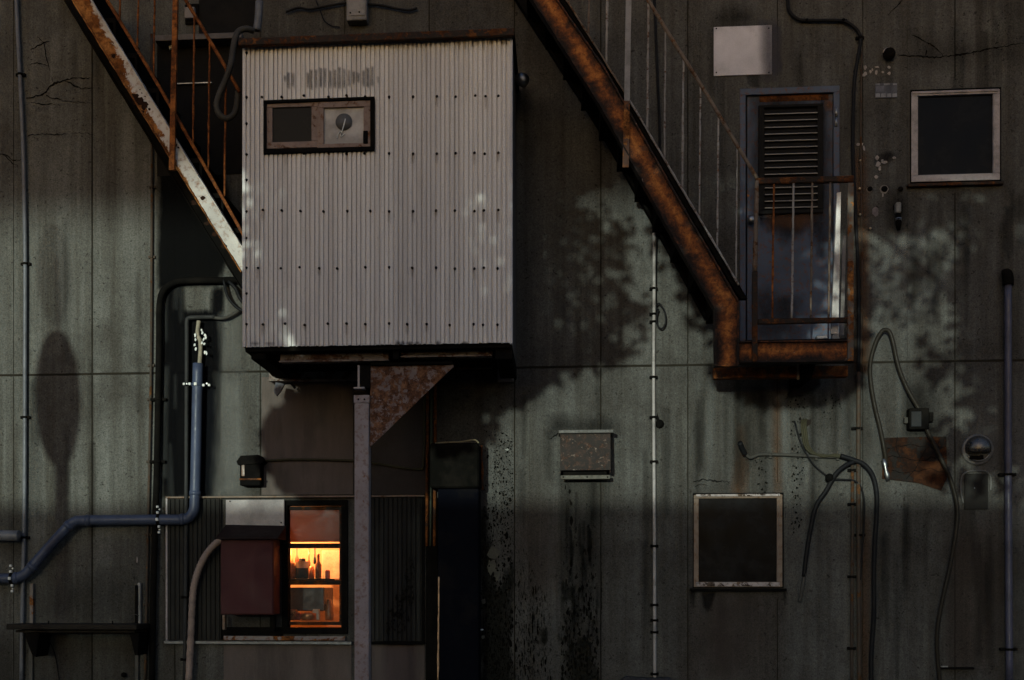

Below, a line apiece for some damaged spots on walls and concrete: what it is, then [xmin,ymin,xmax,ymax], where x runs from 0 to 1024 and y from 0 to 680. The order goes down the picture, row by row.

crack [26,37,90,105]
crack [900,35,1020,59]
leakage [481,438,552,680]